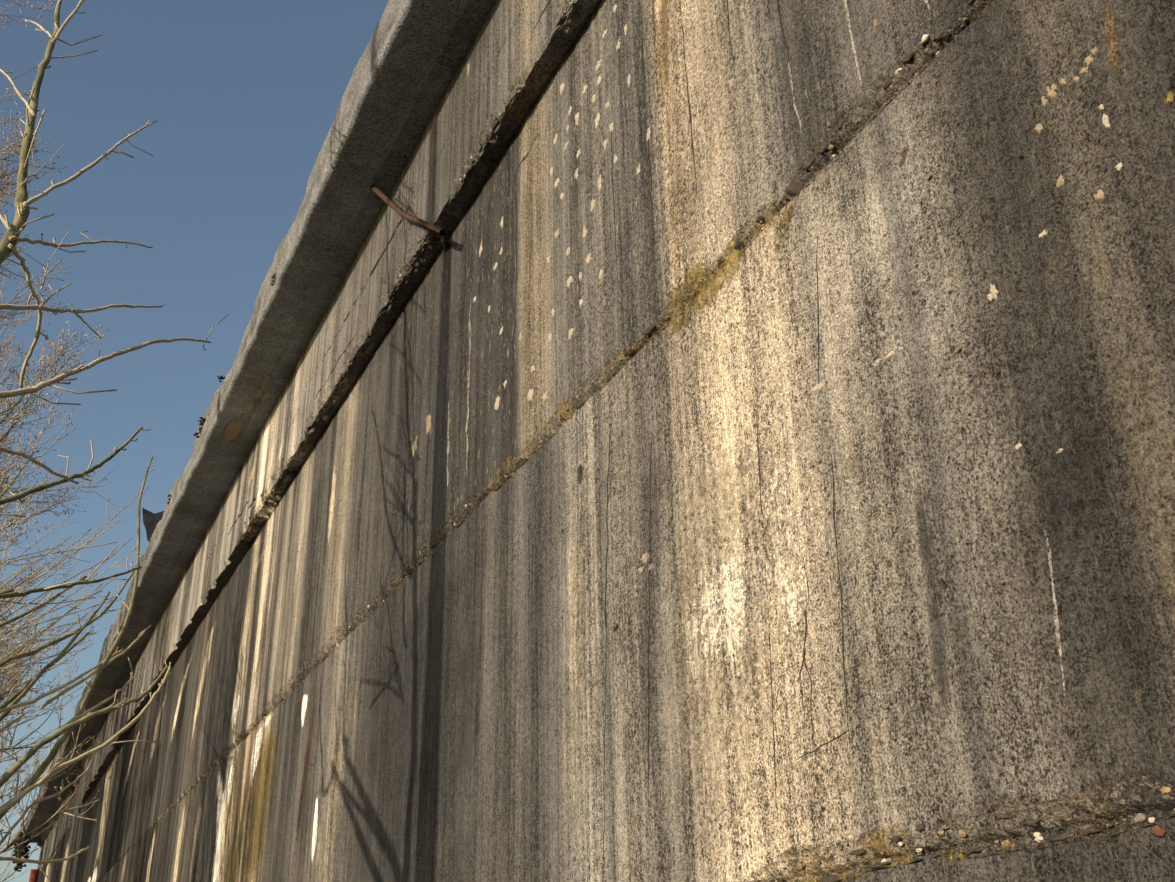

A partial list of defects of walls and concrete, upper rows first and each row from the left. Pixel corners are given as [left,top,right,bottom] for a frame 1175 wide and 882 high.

water stain [658,0,669,95]
water stain [246,437,284,523]
water stain [328,452,351,543]
water stain [44,843,69,882]
water stain [88,623,216,882]
water stain [211,715,277,882]
water stain [231,589,271,732]
water stain [299,694,308,726]
water stain [312,693,356,881]
crack [757,425,851,809]